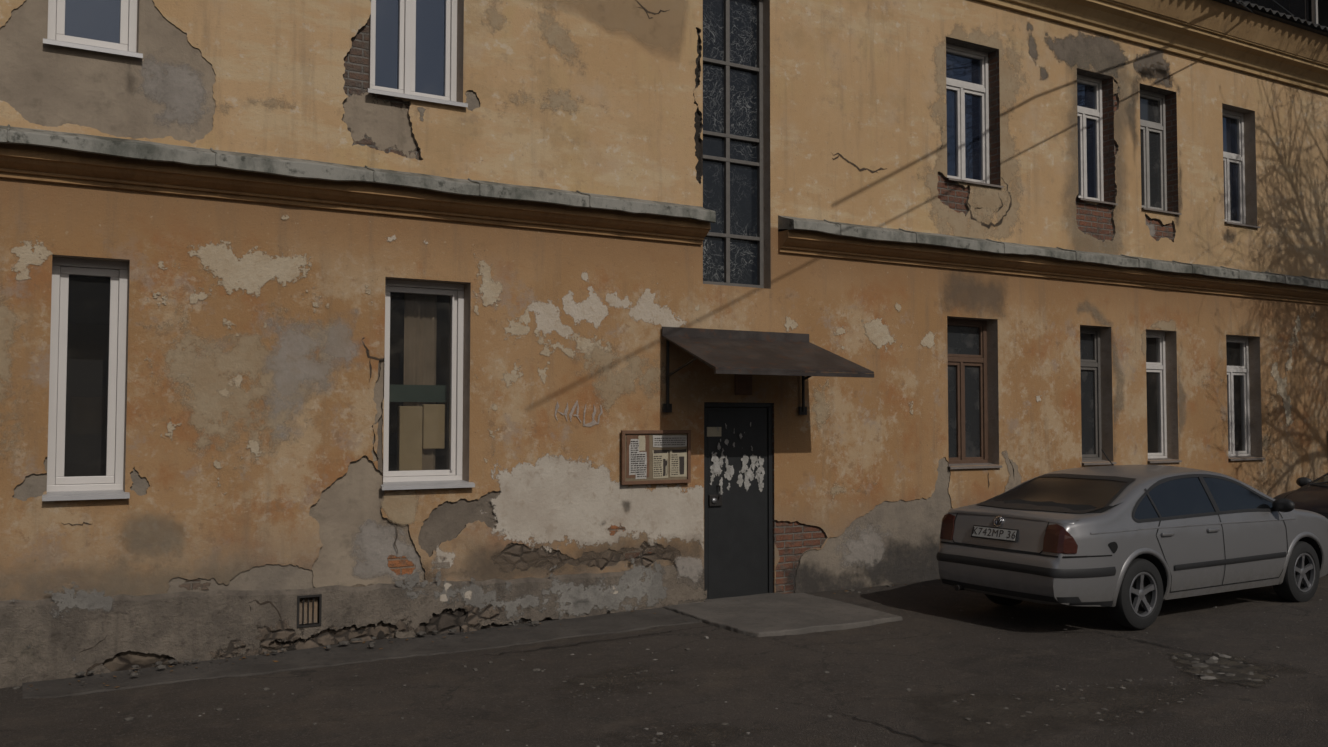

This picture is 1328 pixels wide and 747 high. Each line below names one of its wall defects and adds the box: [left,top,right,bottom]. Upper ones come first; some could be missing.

spalling [341,19,426,160]
crack [833,153,887,173]
peeling [923,23,1025,240]
peeling [144,240,359,495]
crack [362,338,384,381]
peeling [474,253,700,410]
peeling [859,318,935,352]
spalling [12,441,48,501]
spalling [130,467,150,496]
peeling [210,453,707,659]